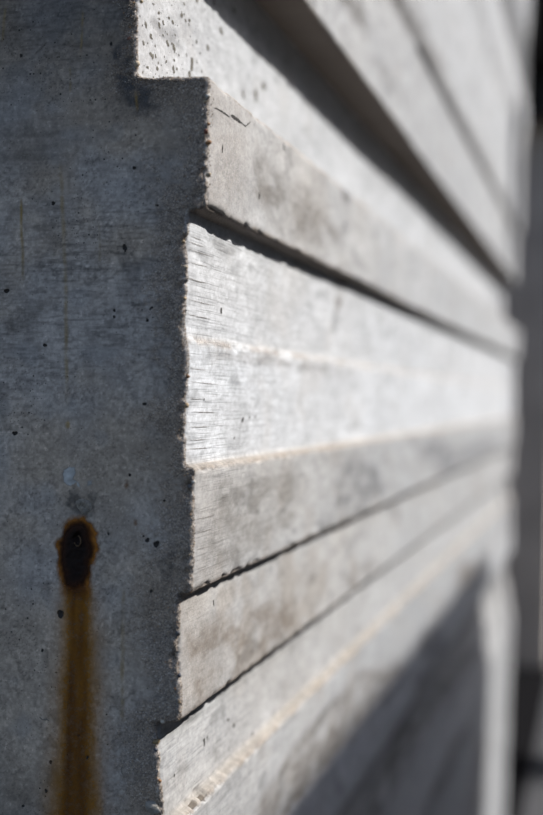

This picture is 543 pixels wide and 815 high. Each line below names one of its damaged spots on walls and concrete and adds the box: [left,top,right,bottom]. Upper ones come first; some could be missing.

rust [54,516,99,815]